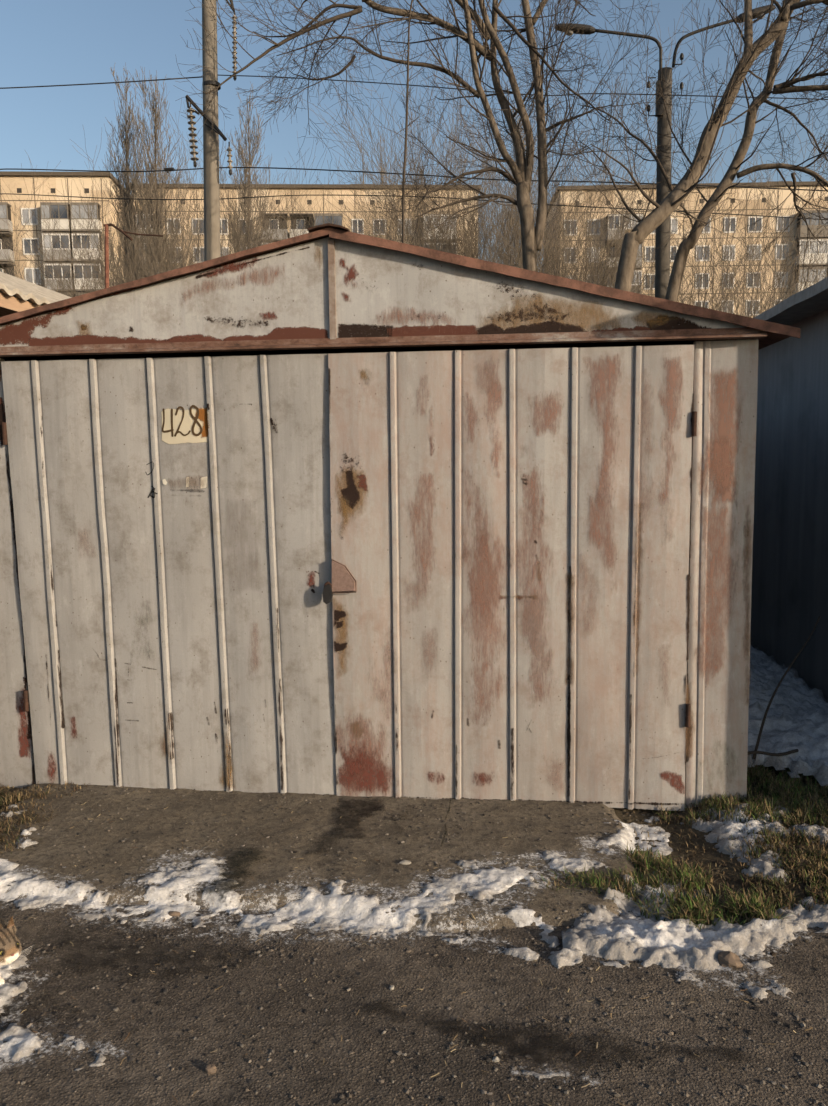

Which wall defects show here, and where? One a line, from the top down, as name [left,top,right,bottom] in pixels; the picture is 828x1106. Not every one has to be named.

rust [0,281,711,346]
rust [0,397,22,614]
rust [331,454,368,532]
rust [417,728,543,801]
rust [556,653,677,806]